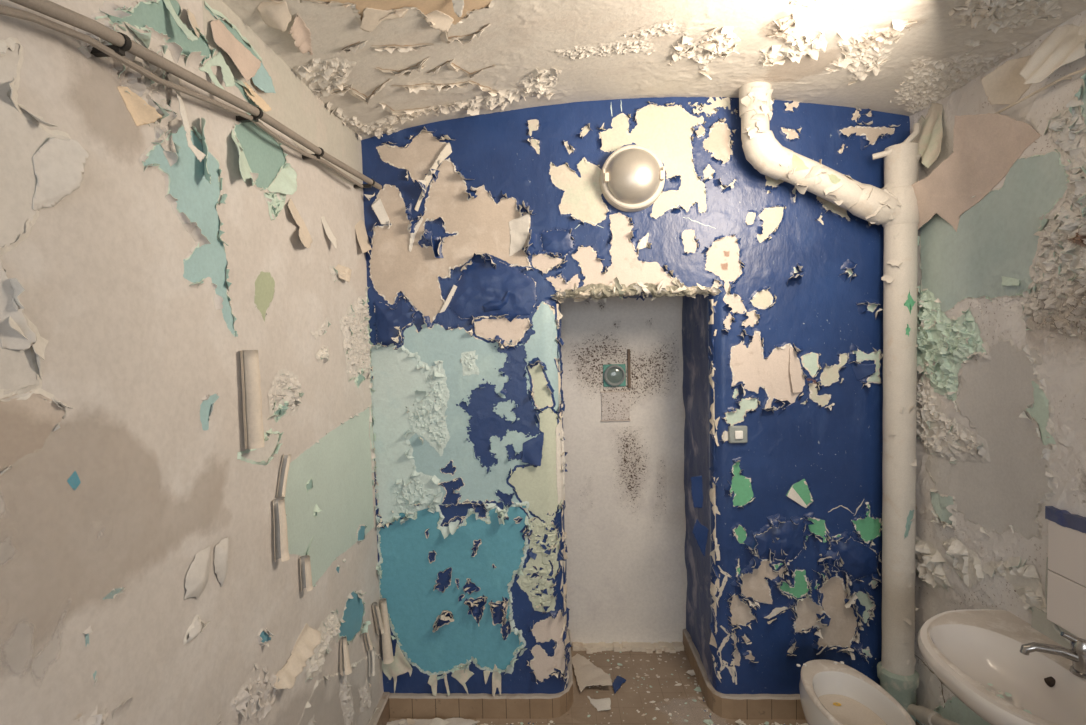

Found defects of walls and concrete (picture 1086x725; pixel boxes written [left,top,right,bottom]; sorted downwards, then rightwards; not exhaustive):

peeling [0,37,72,256]
peeling [835,37,1039,156]
peeling [0,278,74,477]
peeling [70,0,919,725]
water stain [568,322,677,407]
peeling [904,73,1086,614]
peeling [67,471,81,490]
water stain [610,427,666,516]
peeling [929,695,991,725]